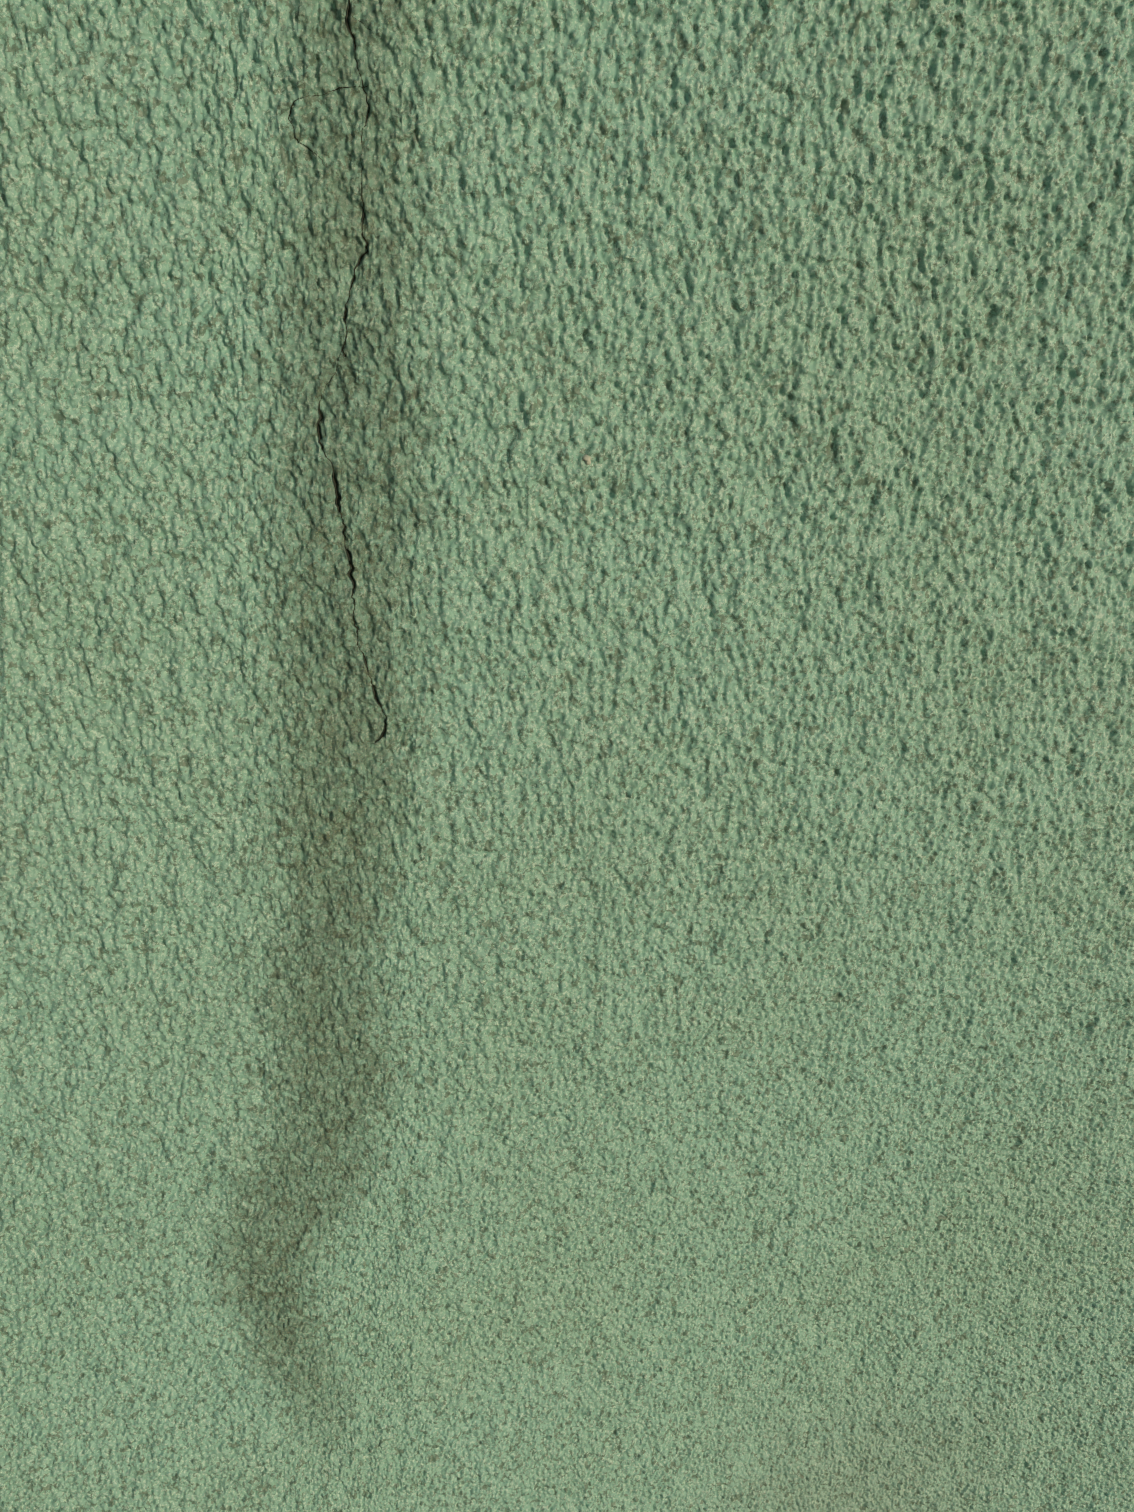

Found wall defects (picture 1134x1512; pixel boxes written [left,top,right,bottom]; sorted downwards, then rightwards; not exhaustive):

crack [288,0,387,743]